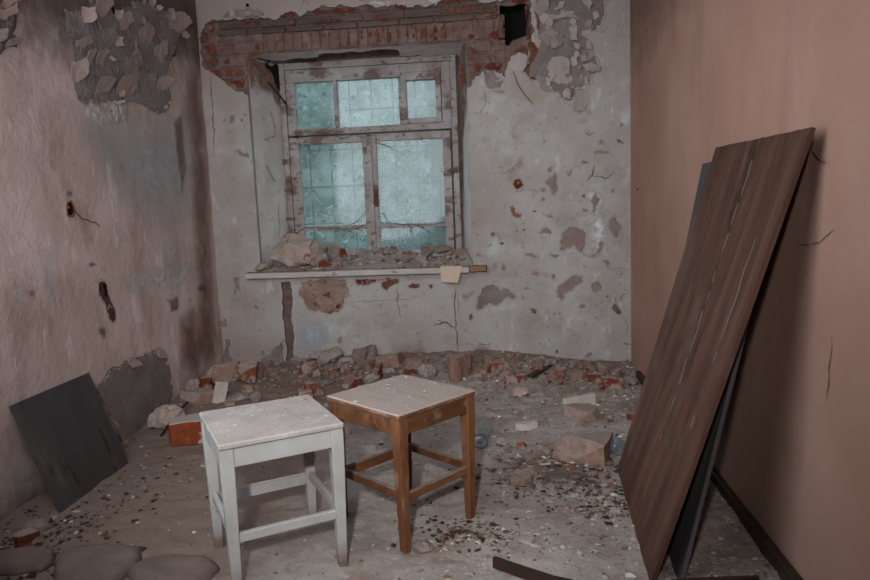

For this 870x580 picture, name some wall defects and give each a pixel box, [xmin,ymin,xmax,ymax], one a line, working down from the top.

peeling [0,0,24,54]
peeling [64,0,192,126]
flaking render [201,0,607,188]
peeling [509,160,623,269]
spalling [96,279,117,324]
flaking render [294,274,441,316]
spalling [464,283,533,332]
peeling [530,270,629,334]
spalling [95,347,175,440]